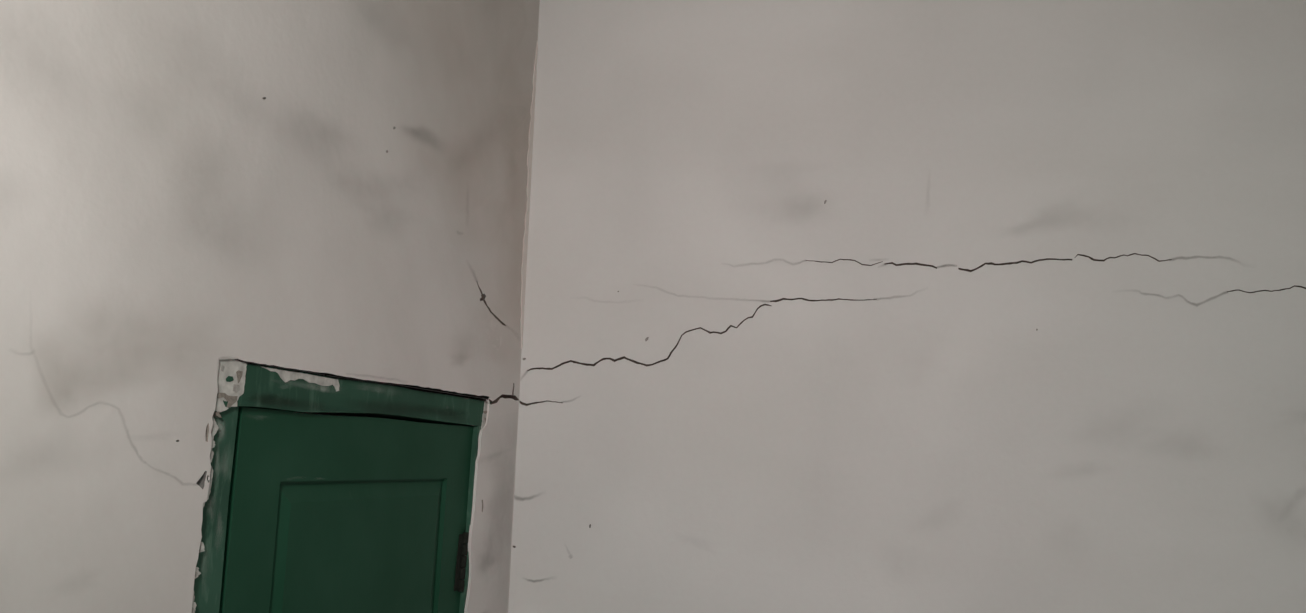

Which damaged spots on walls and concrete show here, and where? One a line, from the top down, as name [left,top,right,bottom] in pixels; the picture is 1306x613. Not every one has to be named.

crack [806,253,1172,272]
crack [477,282,506,326]
crack [1227,285,1306,293]
crack [235,298,877,406]